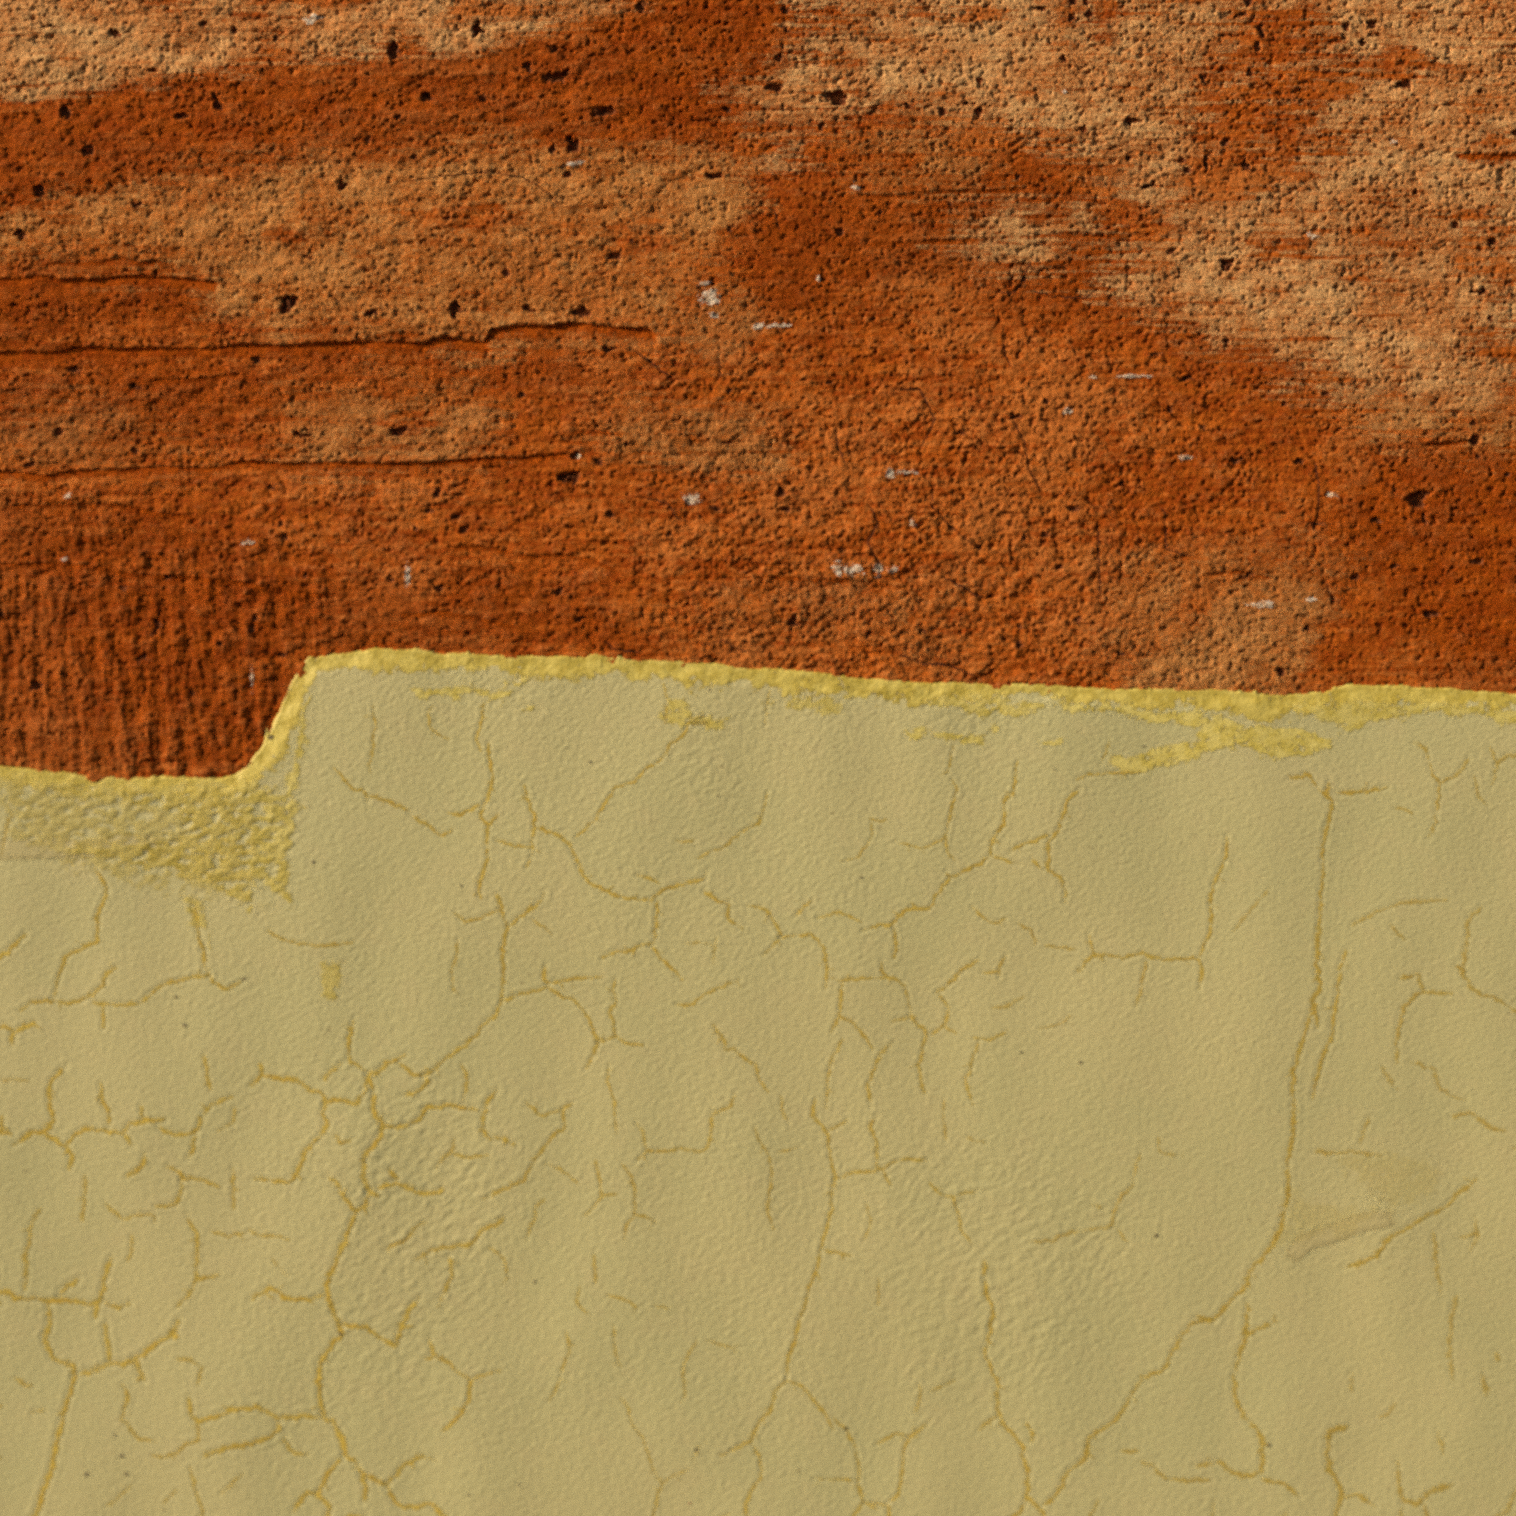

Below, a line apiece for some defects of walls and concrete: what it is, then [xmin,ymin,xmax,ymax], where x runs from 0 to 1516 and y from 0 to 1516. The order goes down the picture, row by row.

spalling [472,19,486,38]
spalling [421,62,570,102]
spalling [824,90,847,106]
spalling [278,295,299,314]
spalling [0,300,656,390]
crack [632,348,672,379]
spalling [1220,259,1235,271]
spalling [0,446,618,573]
crack [1420,744,1468,830]
crack [1395,908,1516,1063]
crack [0,683,1449,1516]
crack [1348,1178,1476,1268]